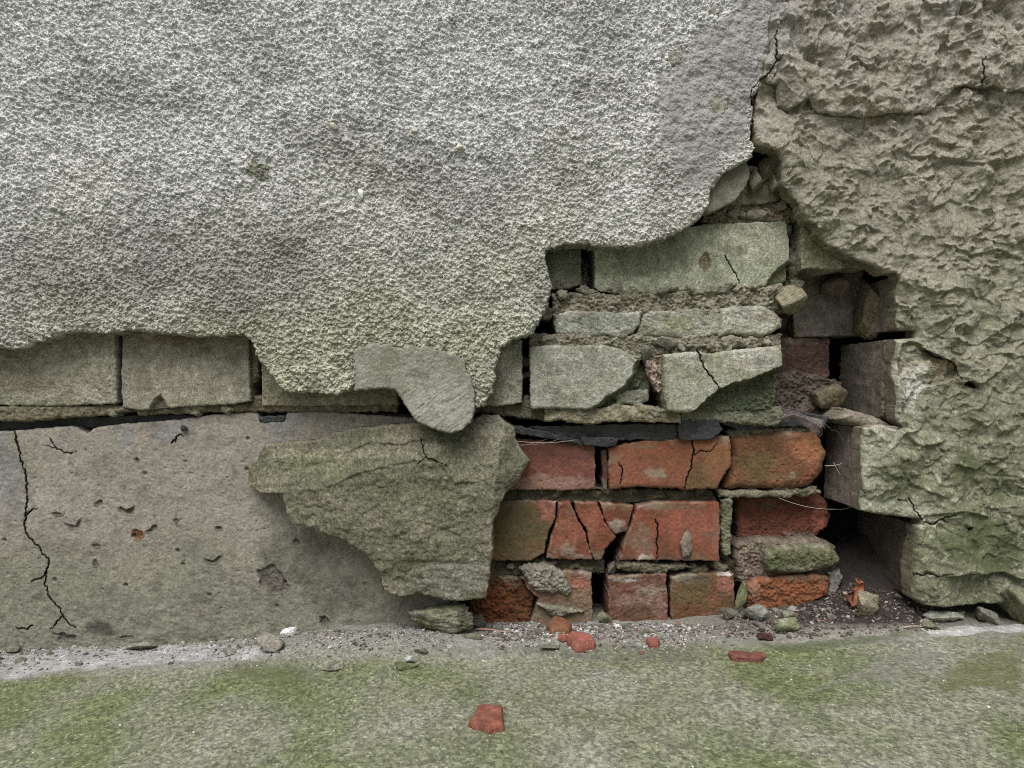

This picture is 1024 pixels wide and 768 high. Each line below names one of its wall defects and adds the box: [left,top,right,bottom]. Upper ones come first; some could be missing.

crack [749,30,783,105]
spalling [473,80,904,412]
spalling [0,325,356,397]
crack [695,349,719,388]
spalling [148,393,168,409]
crack [684,440,719,489]
crack [14,431,76,630]
spalling [50,511,81,530]
crack [897,497,956,525]
spalling [256,563,291,595]